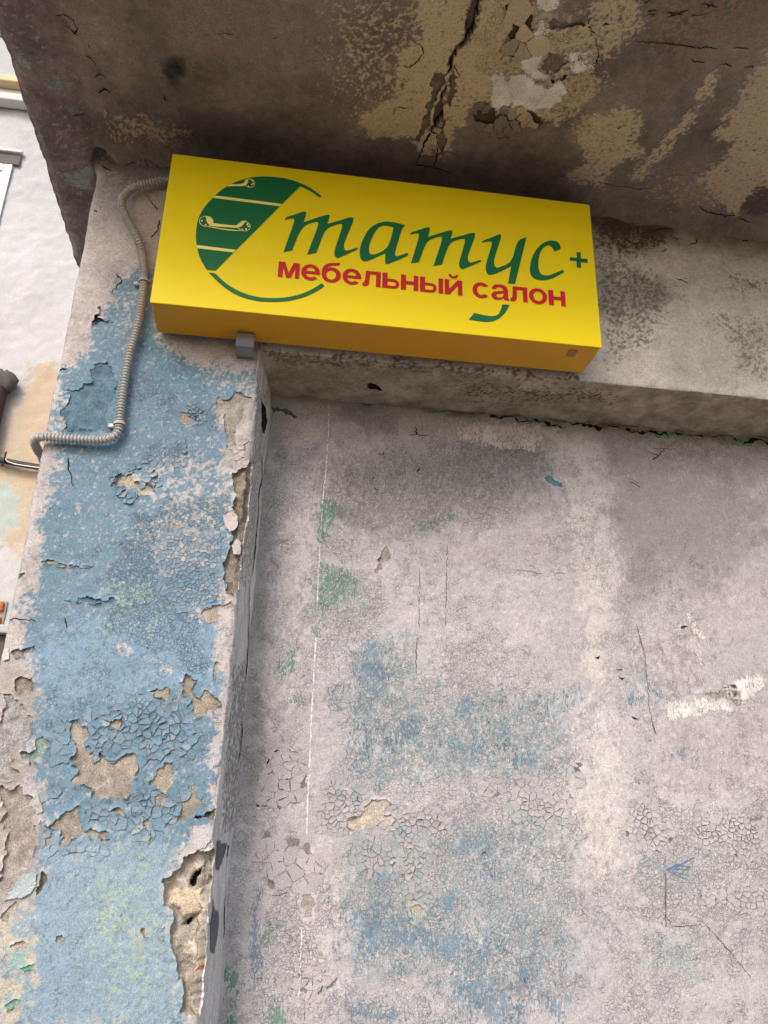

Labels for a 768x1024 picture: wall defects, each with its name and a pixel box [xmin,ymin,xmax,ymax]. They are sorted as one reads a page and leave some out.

leakage [489,0,595,117]
peeling [500,0,590,86]
crack [416,127,452,174]
peeling [465,102,544,145]
peeling [57,359,120,437]
peeling [108,455,163,504]
peeling [155,388,299,628]
crack [246,464,263,675]
spalling [0,641,225,1021]
crack [239,716,457,904]
crack [478,760,584,838]
crack [622,778,768,977]